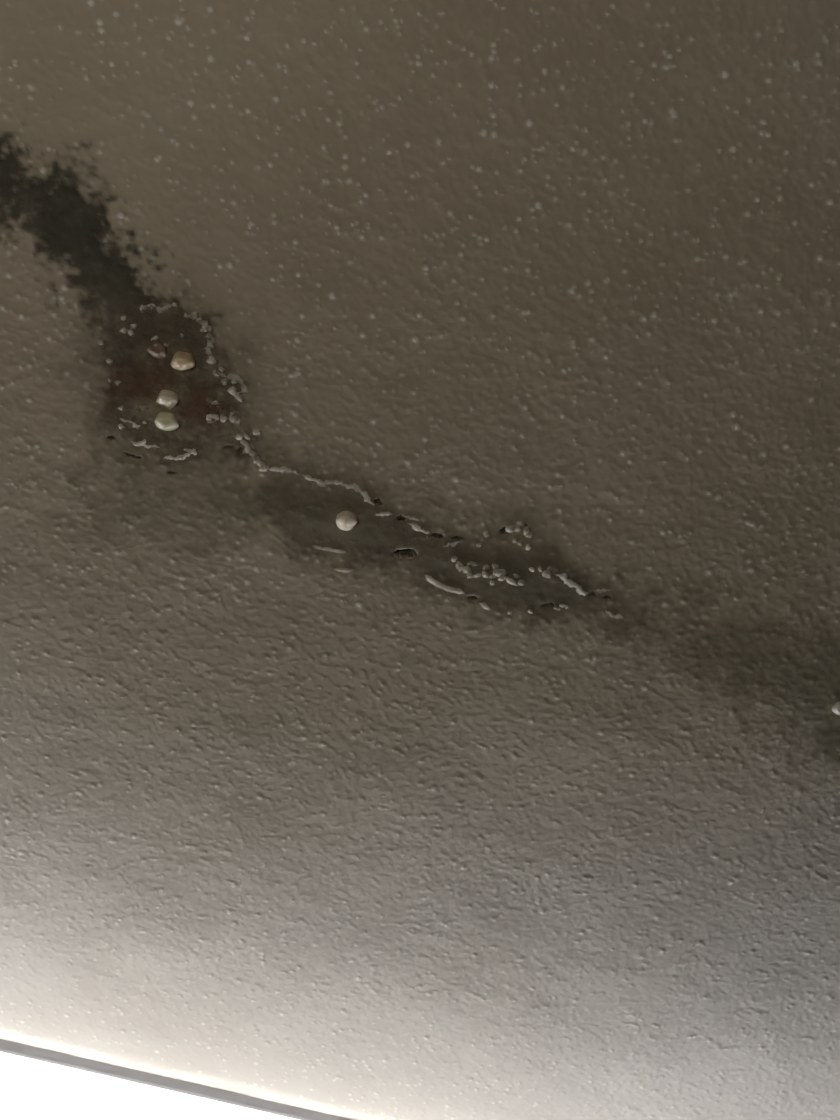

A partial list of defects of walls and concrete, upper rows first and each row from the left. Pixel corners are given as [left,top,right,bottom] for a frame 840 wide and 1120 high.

water stain [0,134,202,380]
spalling [97,301,269,474]
peeling [451,555,552,586]
peeling [476,521,535,550]